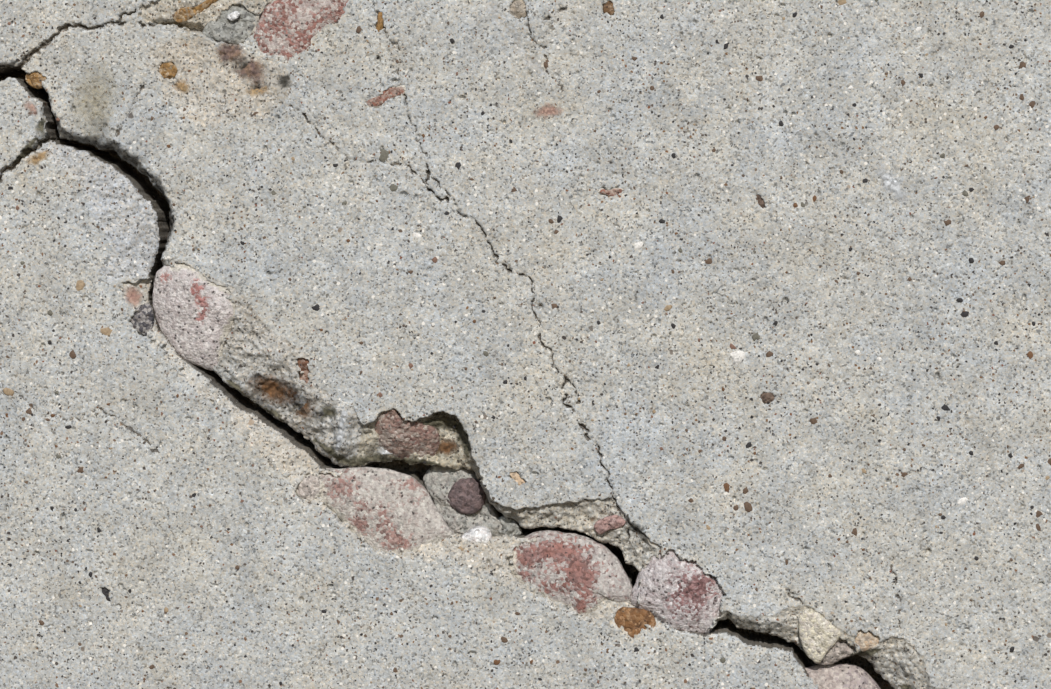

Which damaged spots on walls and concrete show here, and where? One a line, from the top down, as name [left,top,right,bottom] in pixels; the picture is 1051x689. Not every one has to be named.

spalling [138,0,293,127]
crack [0,0,480,502]
spalling [38,140,667,639]
crack [290,0,894,689]
spalling [714,605,935,689]
crack [890,557,902,629]